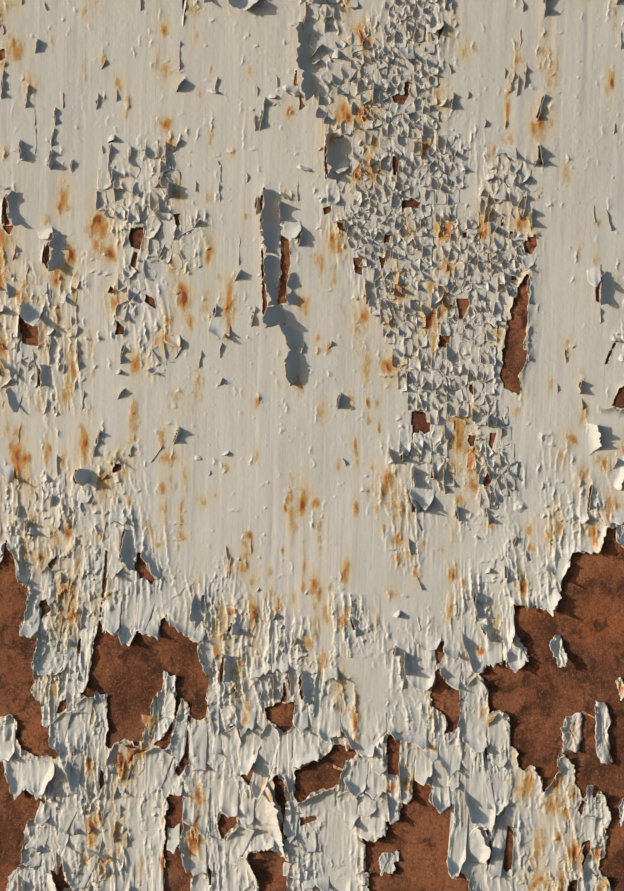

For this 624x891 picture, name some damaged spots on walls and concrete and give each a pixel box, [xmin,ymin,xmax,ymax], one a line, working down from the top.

peeling [95,134,201,322]
peeling [251,183,305,386]
corrosion [492,274,529,394]
peeling [535,484,624,617]
corrosion [80,610,210,781]
peeling [0,543,529,891]
corrosion [479,525,624,891]
peeling [559,712,583,779]
peeling [594,700,613,765]
corrosion [0,760,45,891]
corrosion [159,787,206,891]
corrosion [362,765,471,891]